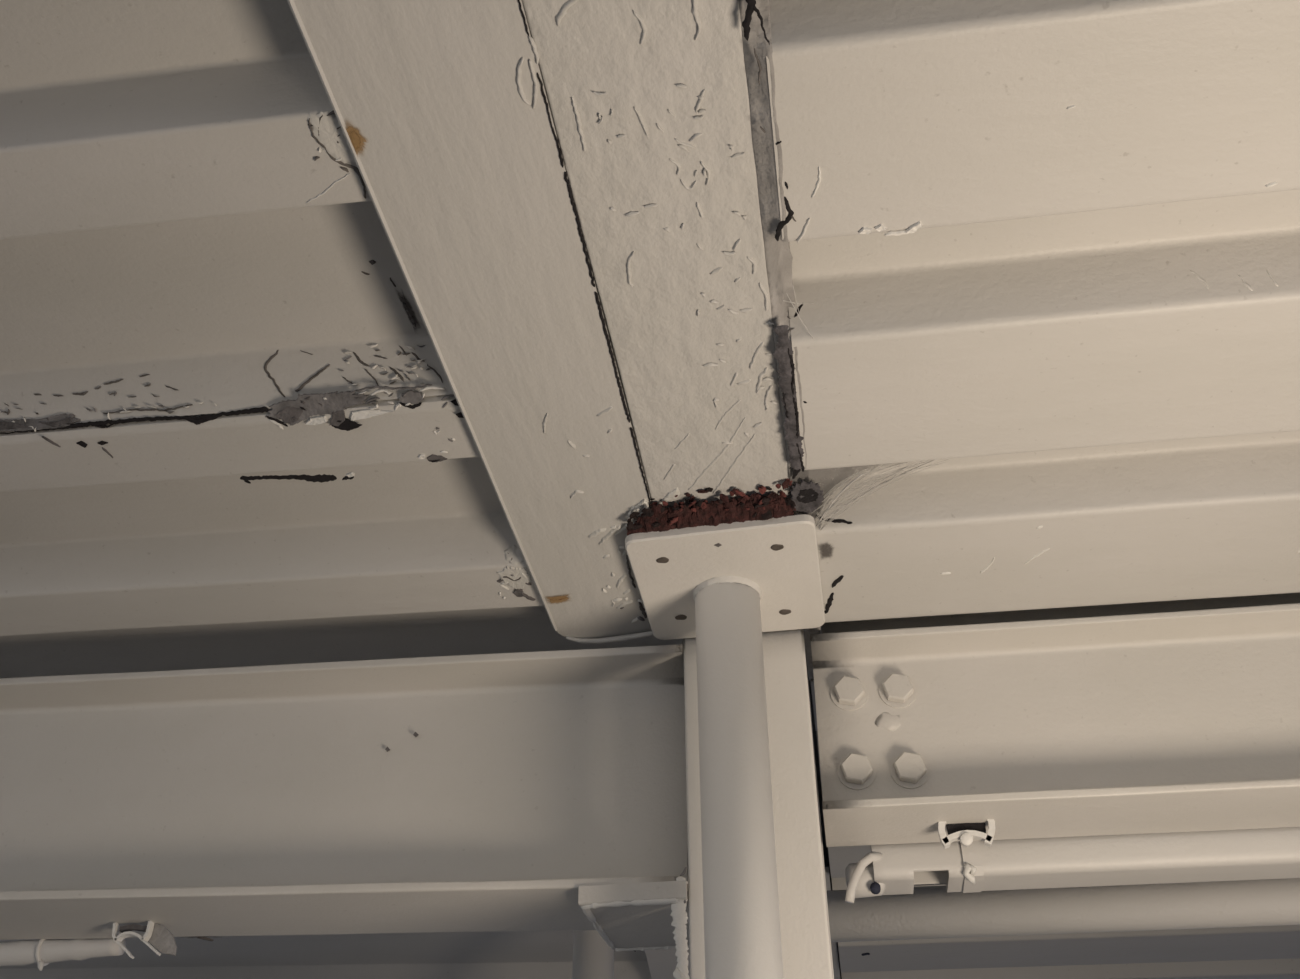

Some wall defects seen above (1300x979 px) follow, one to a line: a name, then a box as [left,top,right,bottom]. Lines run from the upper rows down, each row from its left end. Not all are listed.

corrosion [346,126,366,155]
peeling [265,384,464,431]
peeling [0,413,113,458]
spalling [418,427,455,462]
corrosion [626,478,796,536]